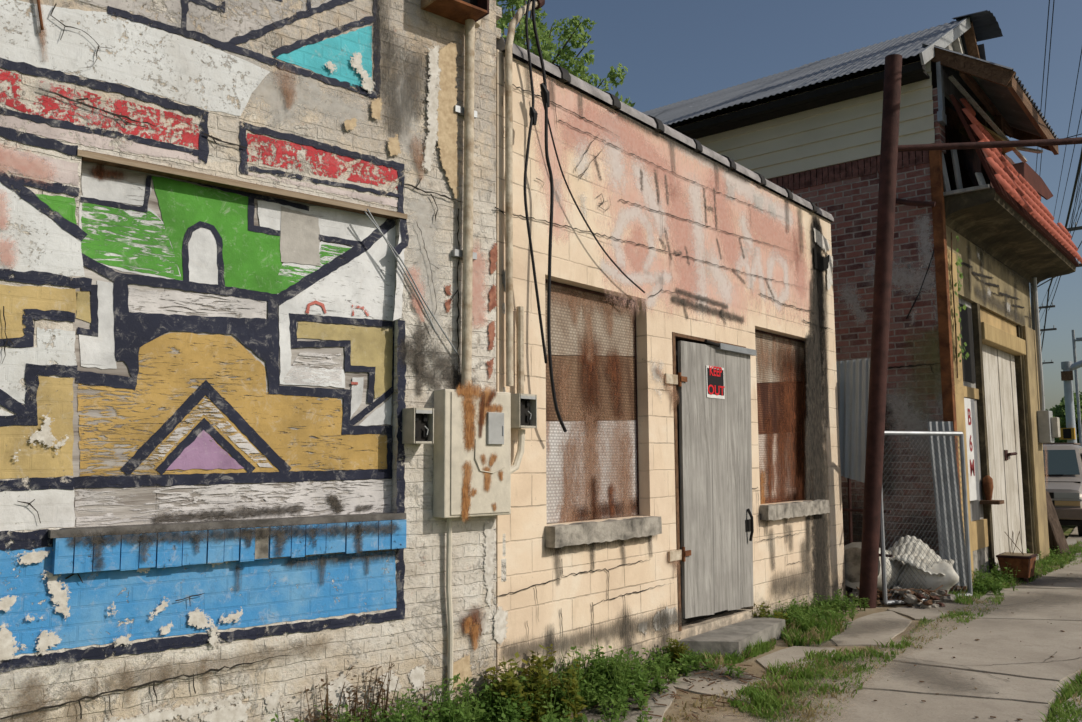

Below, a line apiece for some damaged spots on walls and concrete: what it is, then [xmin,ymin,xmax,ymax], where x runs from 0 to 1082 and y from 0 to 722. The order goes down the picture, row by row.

crack [50,3,112,68]
crack [38,88,160,127]
peeling [212,46,383,131]
peeling [387,42,459,202]
damp [620,112,750,189]
damp [786,202,829,501]
corrosion [551,288,638,522]
corrosion [760,346,810,504]
damp [760,513,831,603]
peeling [0,549,72,661]
peeling [188,607,243,650]
corrosion [463,609,481,650]